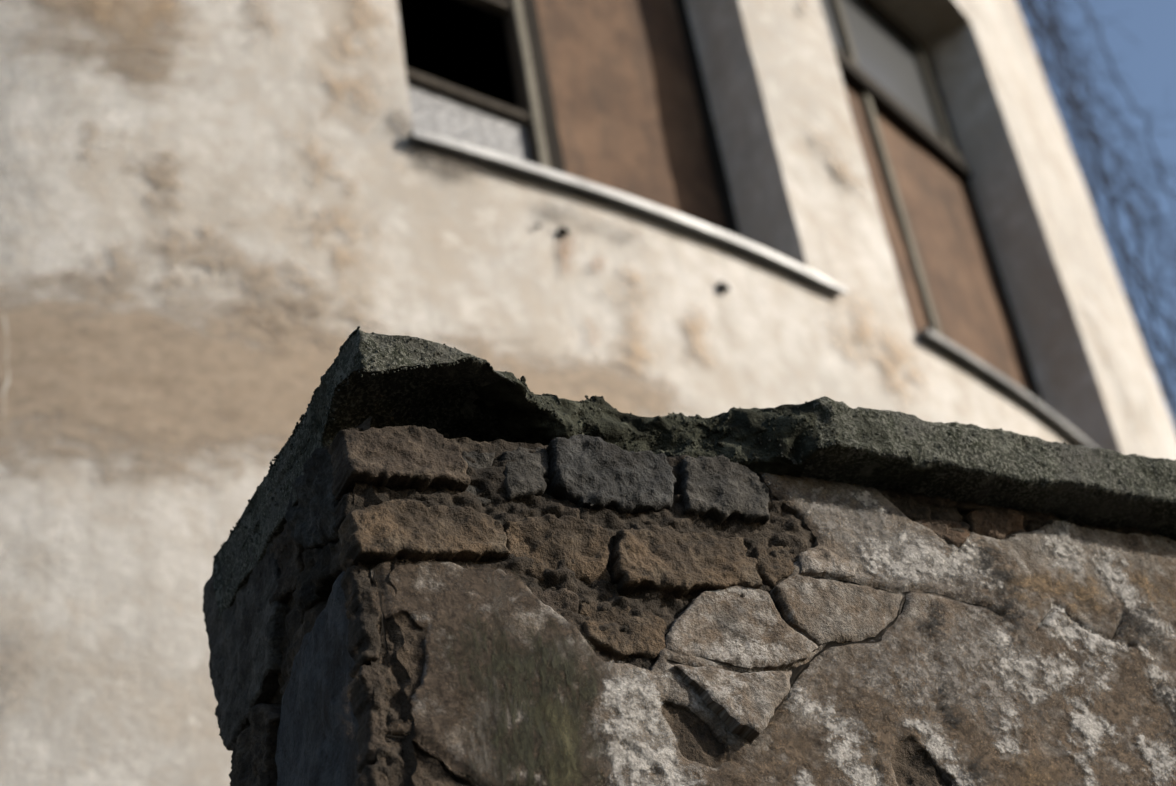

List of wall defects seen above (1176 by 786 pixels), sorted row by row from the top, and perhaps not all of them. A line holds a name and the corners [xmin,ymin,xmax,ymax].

flaking render [328,425,1176,786]
crack [750,577,1001,745]